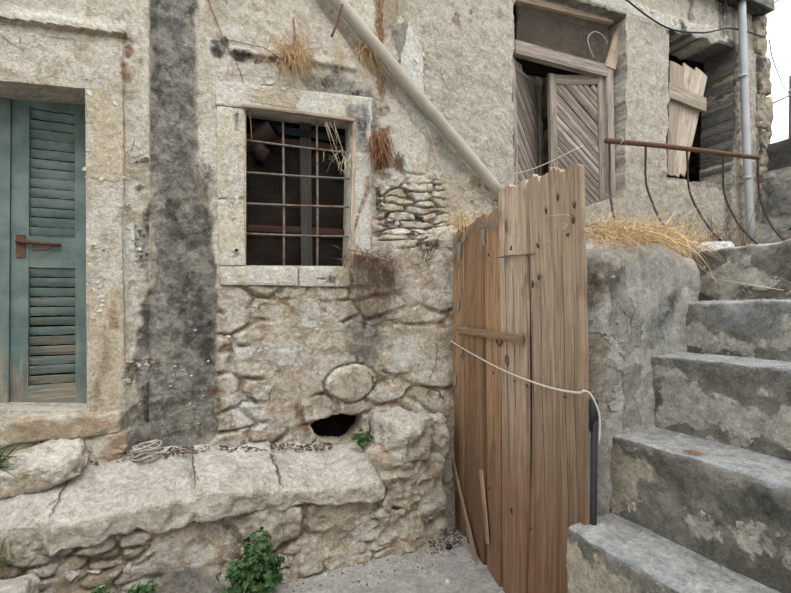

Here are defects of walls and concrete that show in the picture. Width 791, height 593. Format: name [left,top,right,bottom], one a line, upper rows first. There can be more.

spalling [406,214,439,250]